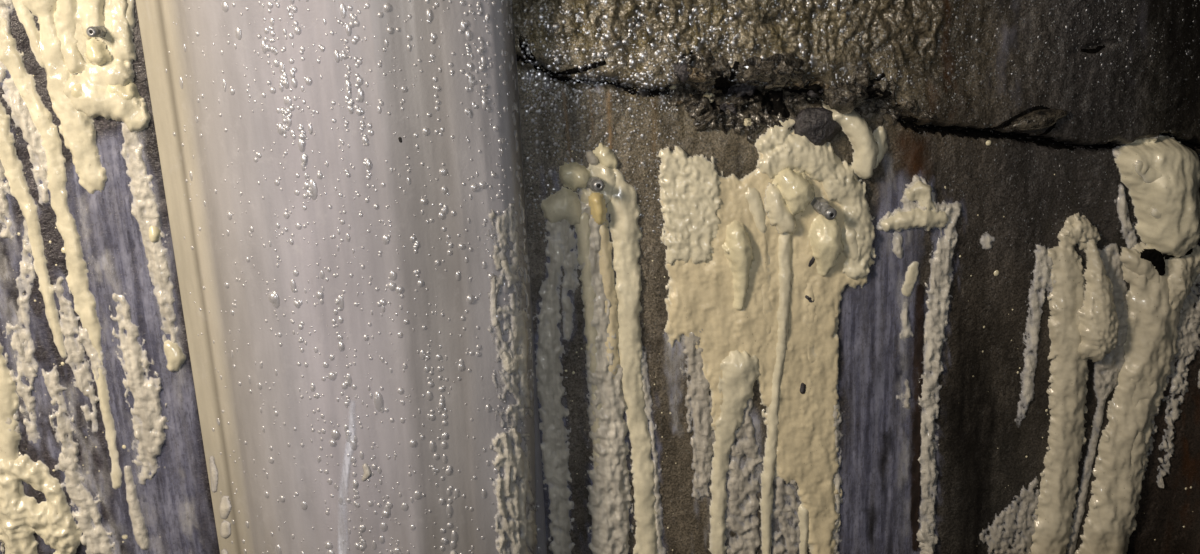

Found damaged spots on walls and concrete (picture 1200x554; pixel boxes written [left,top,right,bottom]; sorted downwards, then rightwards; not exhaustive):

crack [516,34,740,98]
crack [1081,45,1106,54]
crack [872,73,1125,152]
crack [1159,131,1200,150]